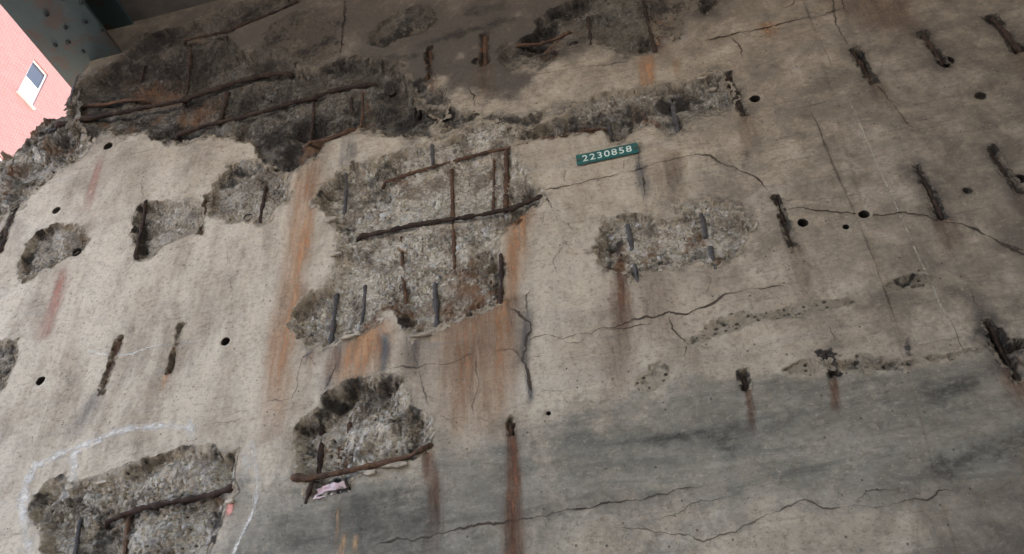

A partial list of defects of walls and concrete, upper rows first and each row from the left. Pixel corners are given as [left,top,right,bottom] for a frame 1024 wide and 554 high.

spalling [0,0,758,352]
rust [270,172,314,383]
rust [617,271,626,312]
crack [507,285,782,395]
spalling [27,443,241,554]
spalling [290,370,436,504]
rust [506,435,520,554]
crack [373,487,947,547]